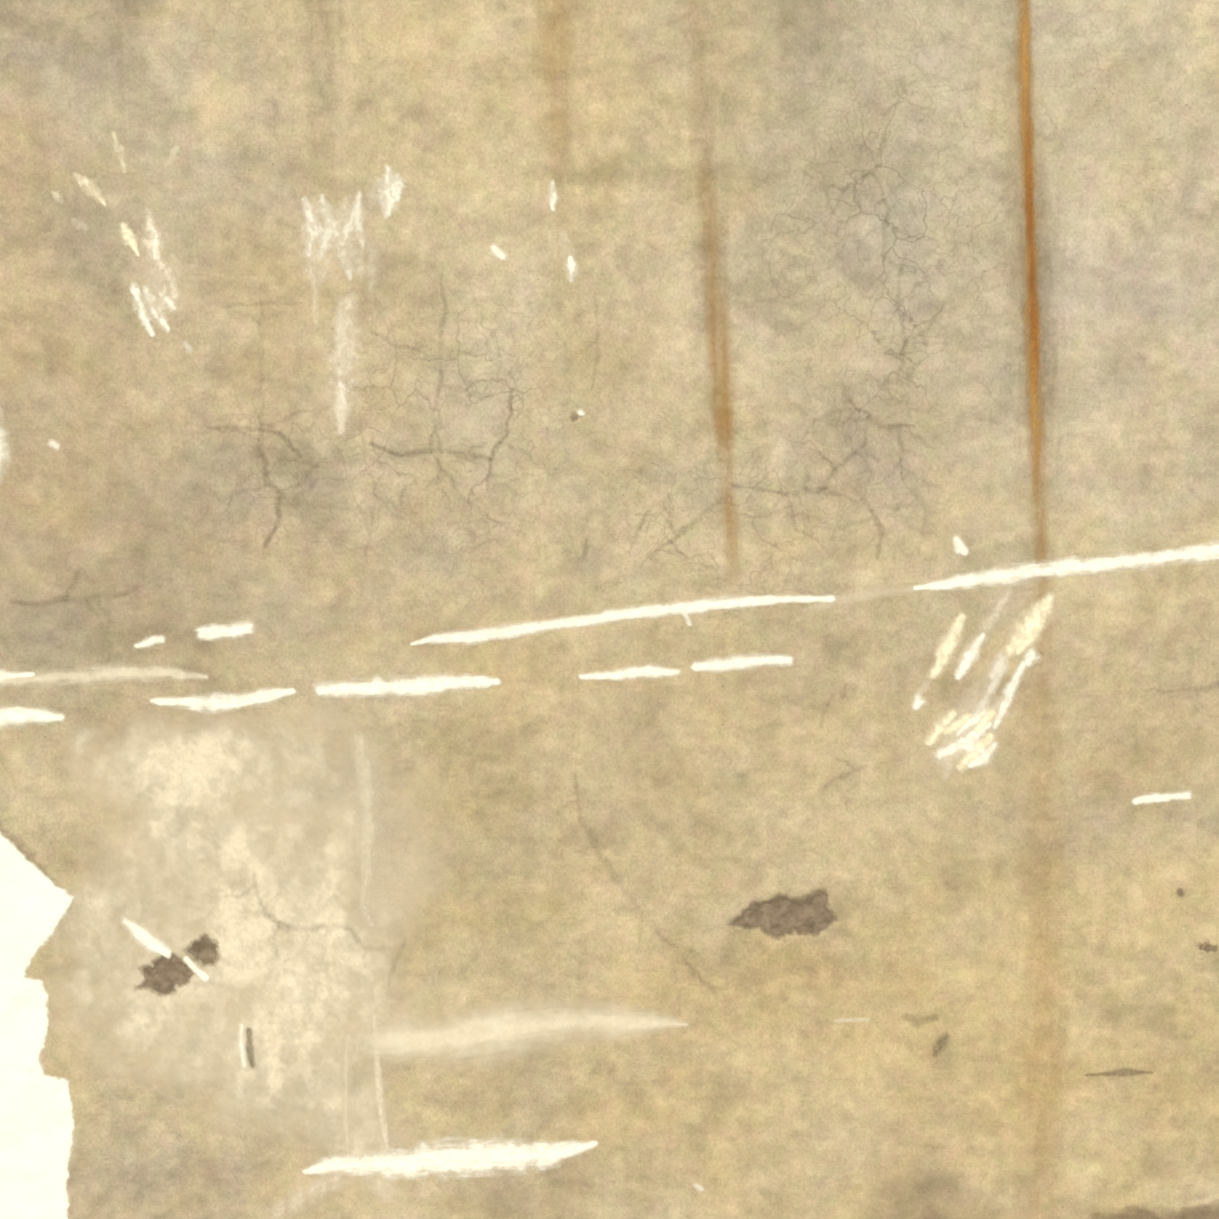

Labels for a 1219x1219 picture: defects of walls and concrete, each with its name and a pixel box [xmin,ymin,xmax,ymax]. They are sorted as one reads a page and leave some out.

rust [1020,0,1041,474]
peeling [0,670,35,683]
peeling [0,707,65,726]
spalling [732,892,836,937]
spalling [122,918,218,994]
peeling [0,833,75,1219]